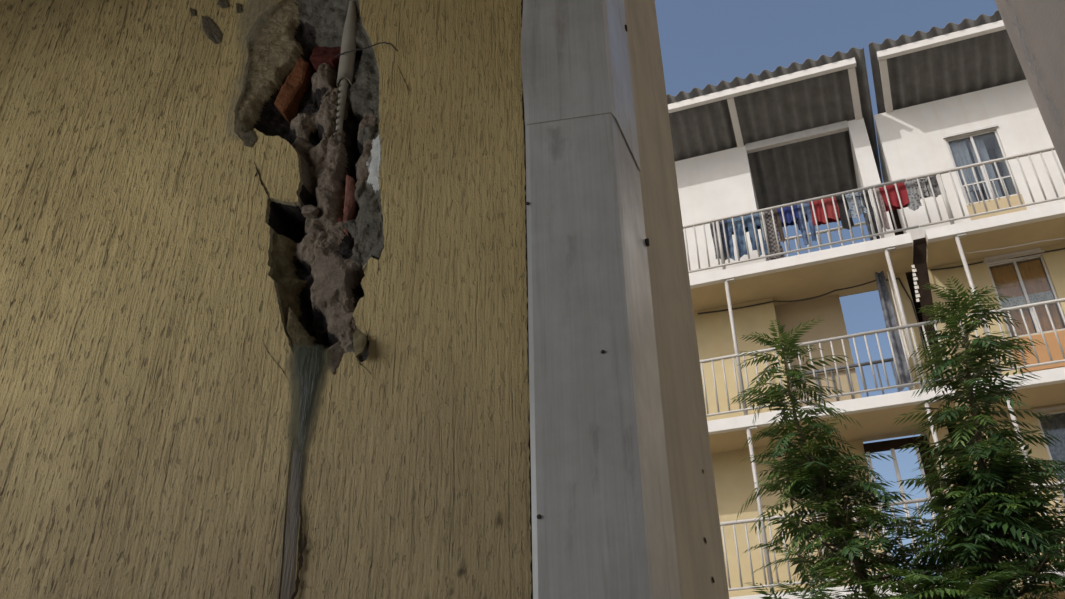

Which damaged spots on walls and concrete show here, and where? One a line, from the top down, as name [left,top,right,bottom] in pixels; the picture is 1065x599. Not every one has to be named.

spalling [234,0,384,374]
crack [291,500,307,599]
water stain [276,345,330,599]